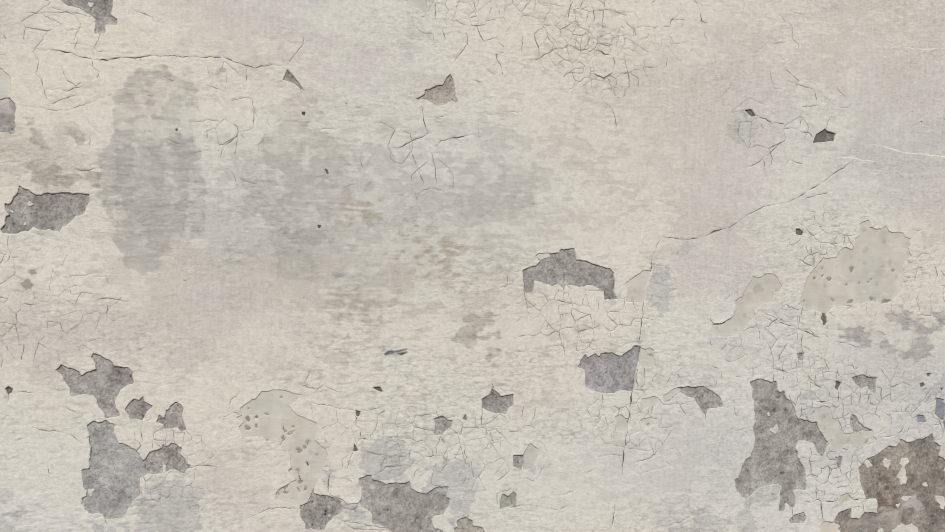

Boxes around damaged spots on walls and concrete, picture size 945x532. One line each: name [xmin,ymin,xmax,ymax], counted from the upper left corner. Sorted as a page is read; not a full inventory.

crack [406,0,707,123]
crack [718,70,852,174]
peeling [1,186,89,237]
crack [787,166,855,266]
crack [0,239,125,366]
peeling [523,248,650,302]
peeling [56,354,191,519]
peeling [359,475,484,532]
peeling [578,346,655,394]
crack [572,368,706,474]
crack [706,295,944,523]
peeling [735,379,945,532]